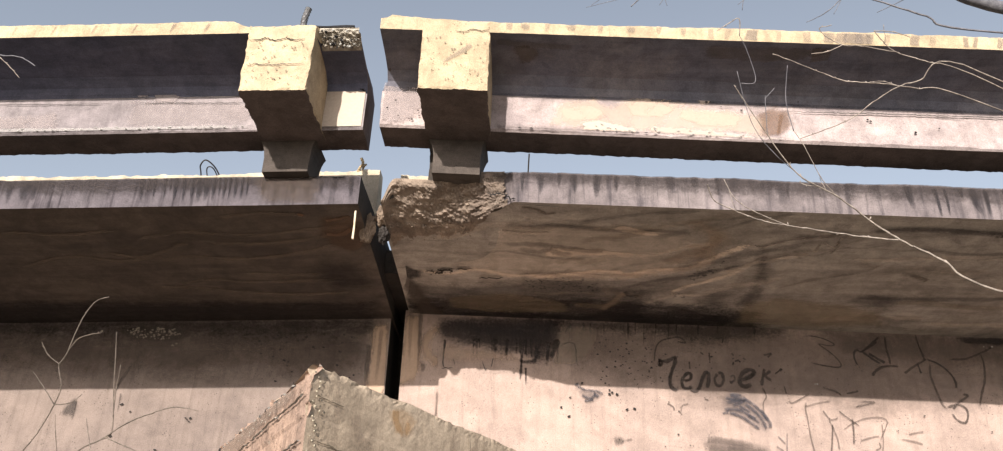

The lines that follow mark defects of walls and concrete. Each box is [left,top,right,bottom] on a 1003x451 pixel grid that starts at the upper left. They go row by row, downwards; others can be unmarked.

spalling [319,28,362,51]
leakage [0,176,357,198]
spalling [381,171,507,246]
leakage [497,172,1003,213]
leakage [877,228,1001,236]
leakage [400,234,845,384]
spalling [218,334,355,451]